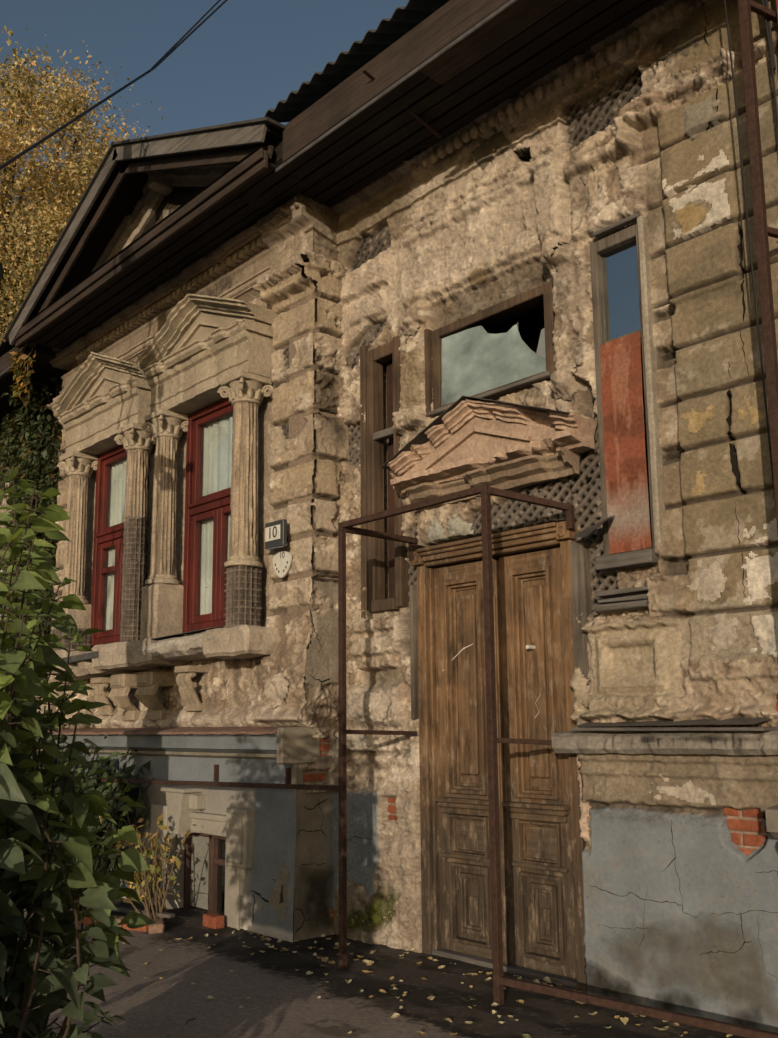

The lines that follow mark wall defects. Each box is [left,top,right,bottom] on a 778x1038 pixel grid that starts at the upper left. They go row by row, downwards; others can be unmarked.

peeling [662,149,731,242]
crack [726,222,754,630]
peeling [687,518,778,657]
crack [297,796,369,840]
flaking render [387,797,398,821]
flaking render [649,774,770,856]
crack [242,879,276,922]
crack [589,820,778,977]
leakage [589,969,631,1000]
leakage [648,925,763,1027]